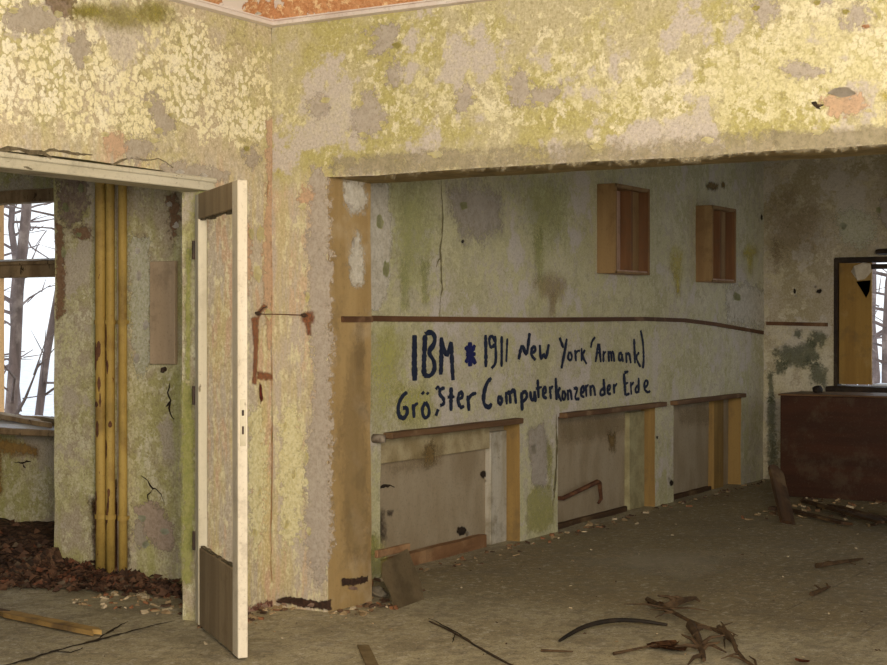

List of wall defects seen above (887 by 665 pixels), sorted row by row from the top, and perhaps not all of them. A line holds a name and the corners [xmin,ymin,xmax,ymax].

spalling [2,0,77,36]
peeling [242,0,423,19]
spalling [839,3,871,31]
spalling [67,30,96,70]
spalling [101,91,231,184]
crack [436,183,444,317]
rust [302,312,314,335]
rust [251,305,273,404]
water stain [767,330,826,465]
crack [6,620,175,665]